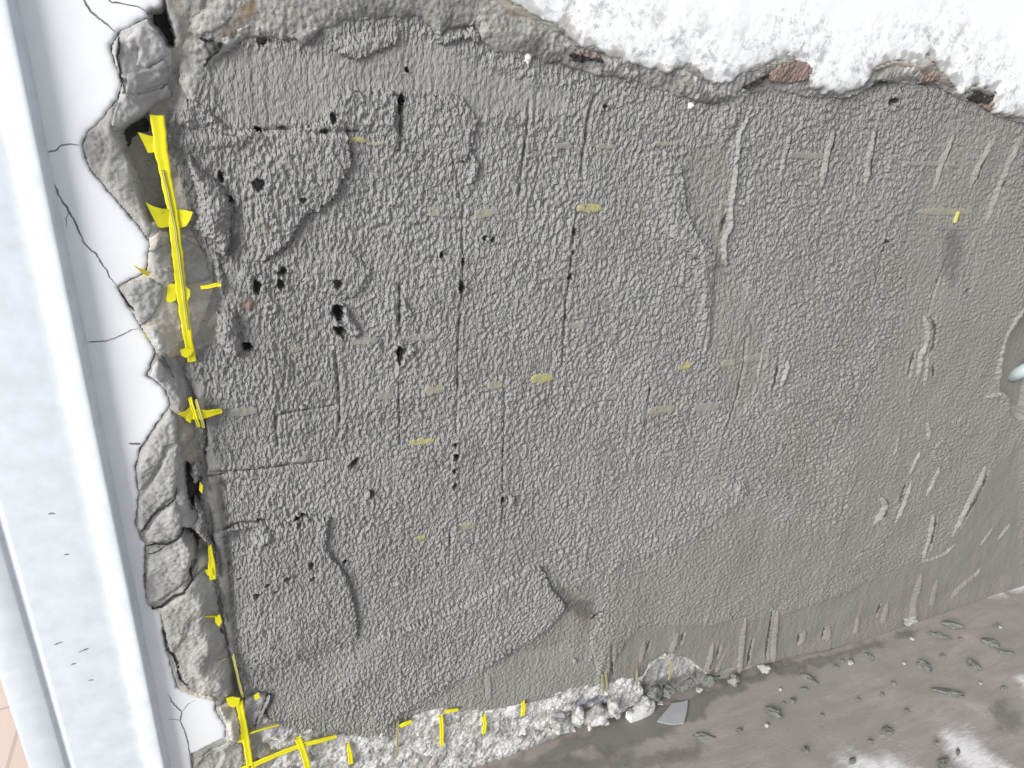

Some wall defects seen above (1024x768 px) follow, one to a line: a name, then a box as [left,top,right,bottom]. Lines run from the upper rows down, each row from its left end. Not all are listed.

crack [48,143,77,153]
crack [83,0,146,132]
crack [396,98,404,145]
spalling [178,0,1024,125]
crack [54,183,138,343]
crack [453,162,464,417]
crack [562,217,576,361]
spalling [82,10,244,768]
crack [140,487,271,648]
peeling [244,690,266,725]
peeling [404,716,479,753]
spalling [638,653,712,693]